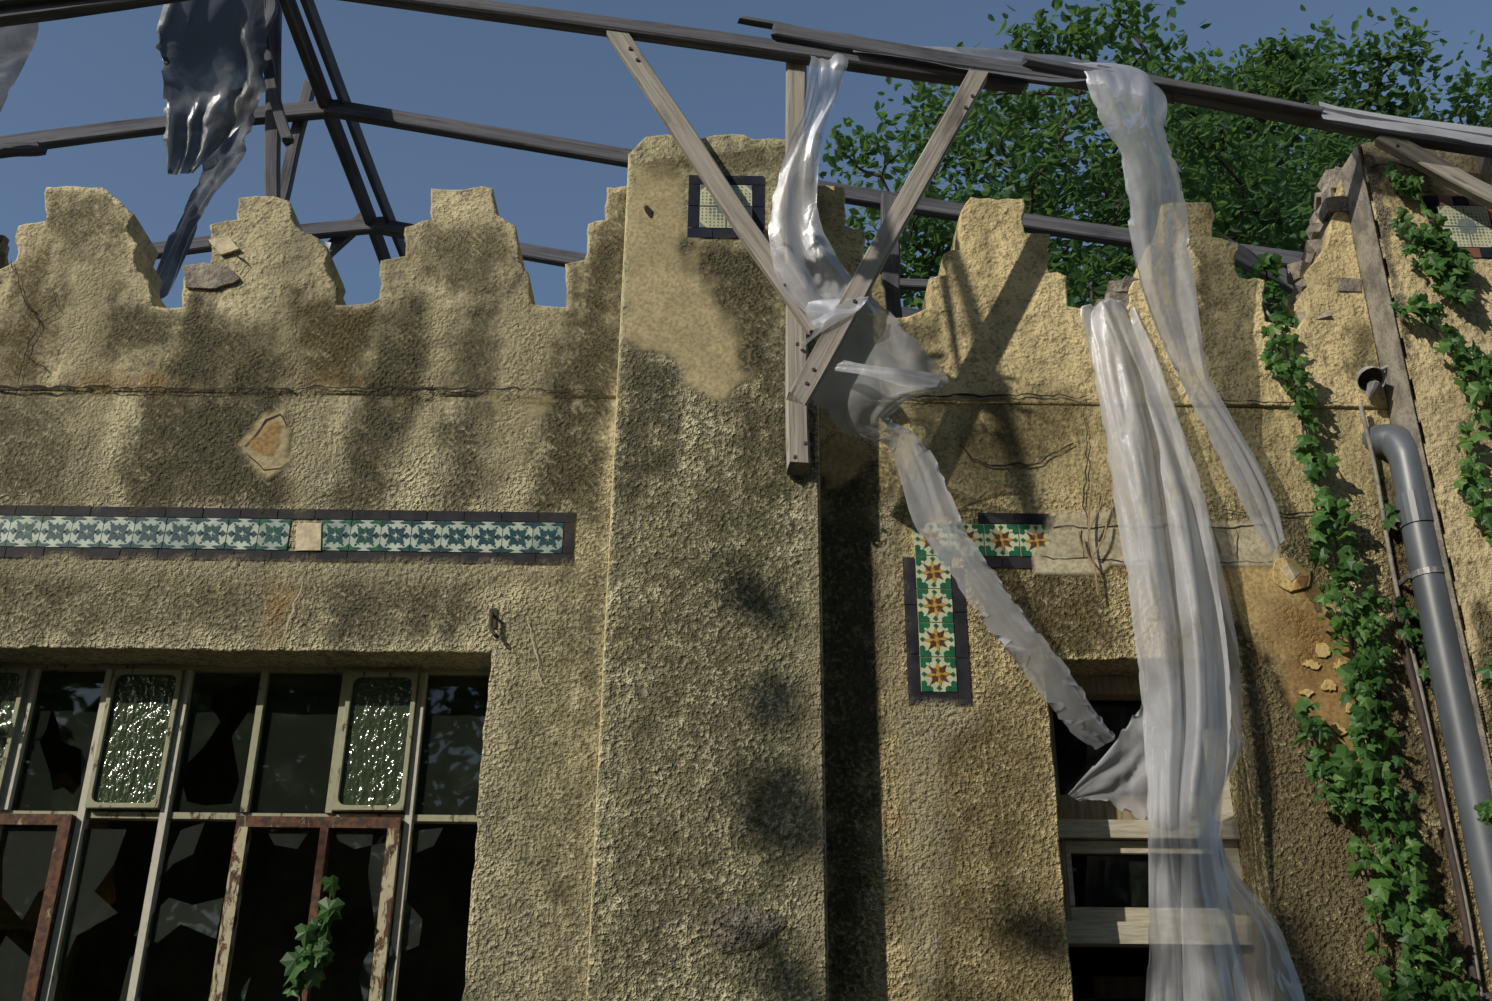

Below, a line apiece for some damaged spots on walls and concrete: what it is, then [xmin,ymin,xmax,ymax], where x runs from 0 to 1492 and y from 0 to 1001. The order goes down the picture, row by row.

water stain [45,197,120,240]
water stain [0,248,167,503]
spalling [239,409,290,477]
crack [0,261,603,470]
water stain [130,230,677,508]
water stain [701,250,787,488]
water stain [800,460,975,994]
crack [914,393,1123,562]
peeling [1034,511,1125,574]
crack [1211,509,1315,563]
crack [1222,398,1355,406]
flaking render [1211,522,1399,763]